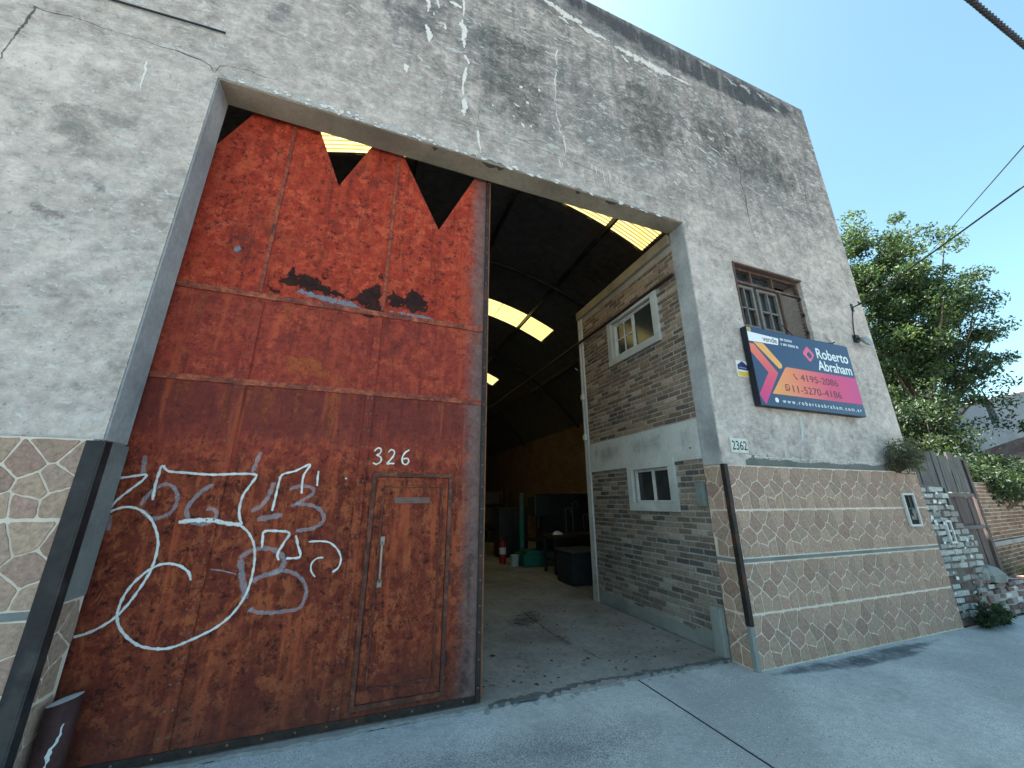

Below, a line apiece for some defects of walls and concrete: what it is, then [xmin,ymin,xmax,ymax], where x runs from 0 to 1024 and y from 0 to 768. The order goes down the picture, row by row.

crack [0,5,291,86]
peeling [425,0,462,42]
damp [569,0,796,116]
rust [267,267,434,319]